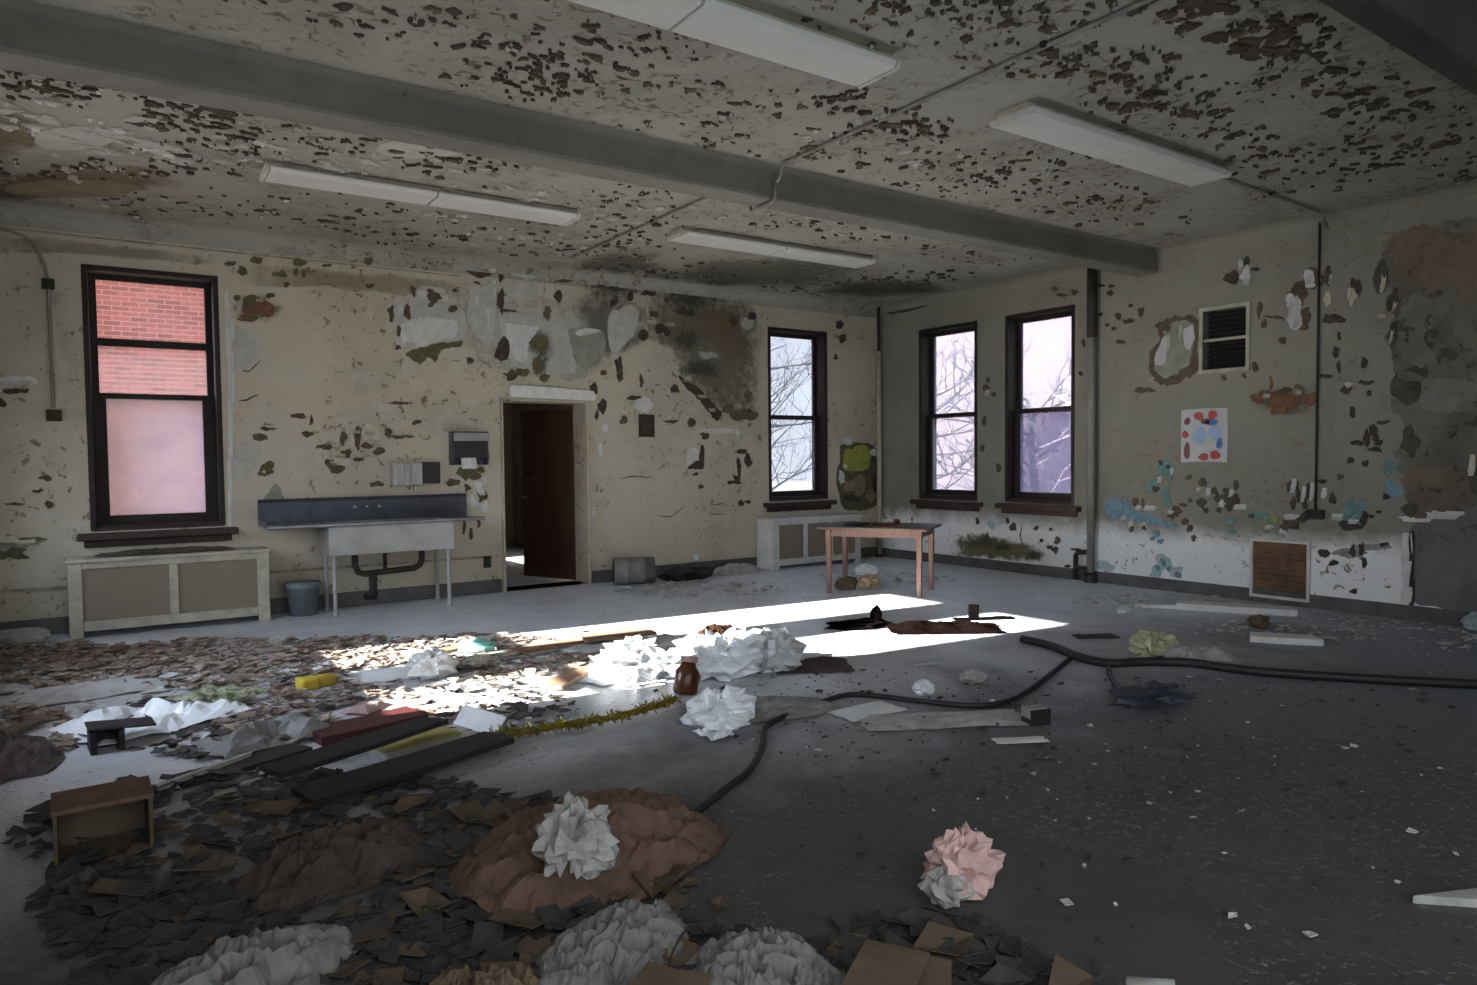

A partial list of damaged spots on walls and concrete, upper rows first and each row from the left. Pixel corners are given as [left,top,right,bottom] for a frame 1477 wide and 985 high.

water stain [0,115,32,147]
peeling [306,1,1161,228]
peeling [850,0,1477,196]
spalling [0,69,1032,424]
water stain [476,255,939,421]
peeling [4,475,55,509]
spalling [663,418,755,506]